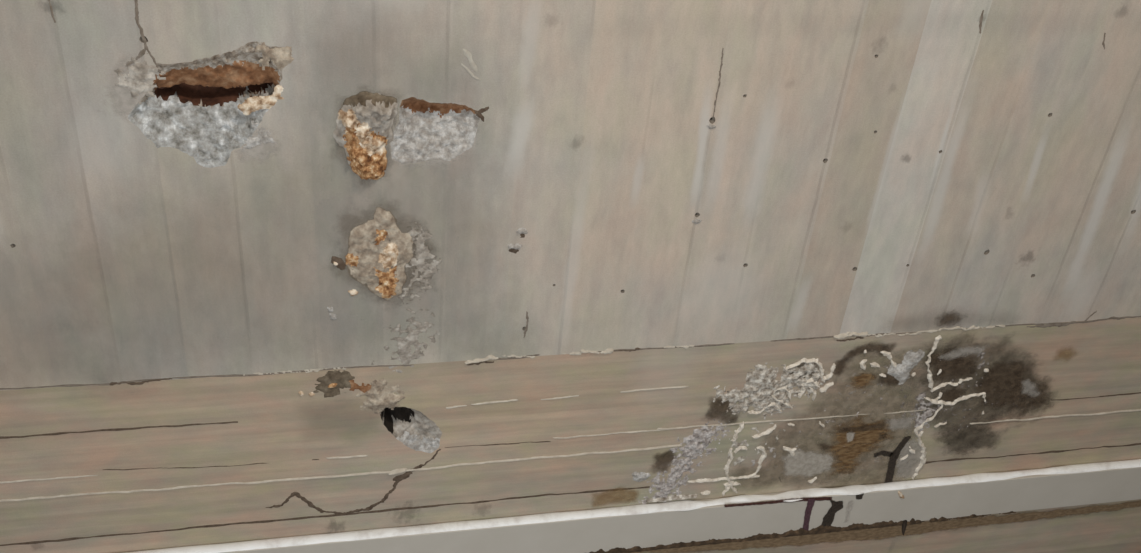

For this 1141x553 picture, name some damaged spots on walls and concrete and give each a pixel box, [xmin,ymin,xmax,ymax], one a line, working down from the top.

crack [125,0,161,73]
spalling [114,41,294,168]
spalling [390,97,489,164]
spalling [380,407,442,453]
water stain [638,340,1049,531]
crack [265,449,441,514]
rust [589,501,1141,553]